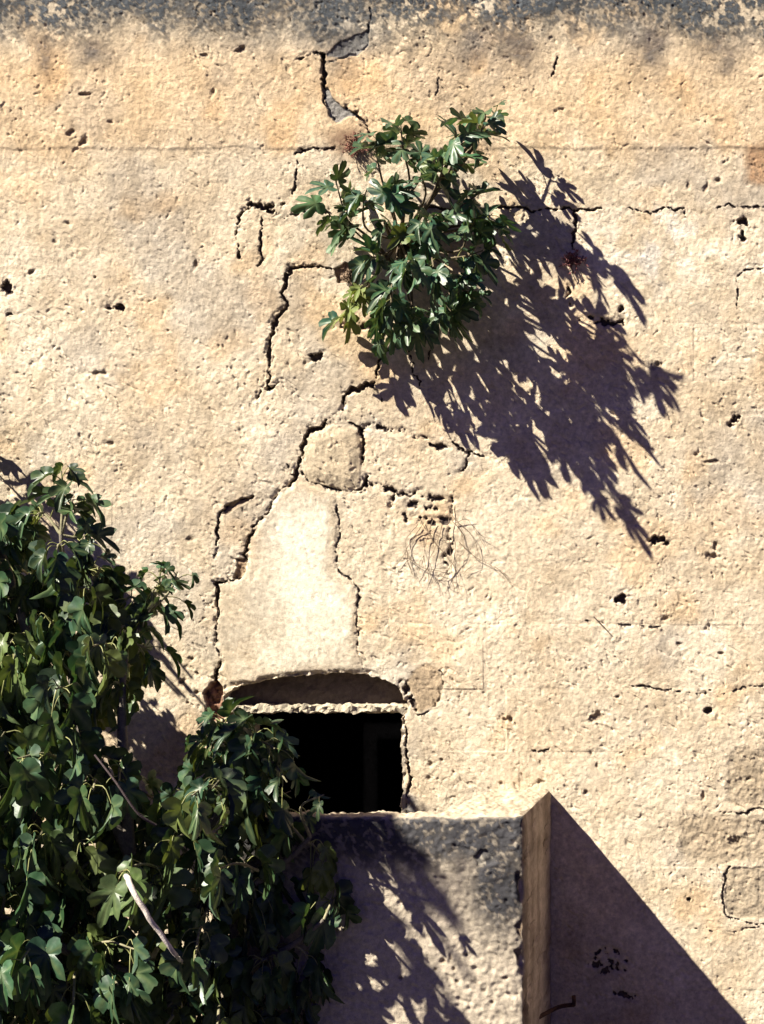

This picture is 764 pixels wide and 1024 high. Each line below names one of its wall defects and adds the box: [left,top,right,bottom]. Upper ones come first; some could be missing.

spalling [326,31,369,59]
damp [0,0,764,60]
crack [298,51,371,133]
spalling [322,87,357,123]
crack [428,204,451,212]
crack [480,205,602,250]
crack [629,206,686,218]
crack [717,201,760,209]
crack [235,147,335,399]
crack [452,442,485,472]
crack [213,344,431,682]
crack [694,866,764,933]